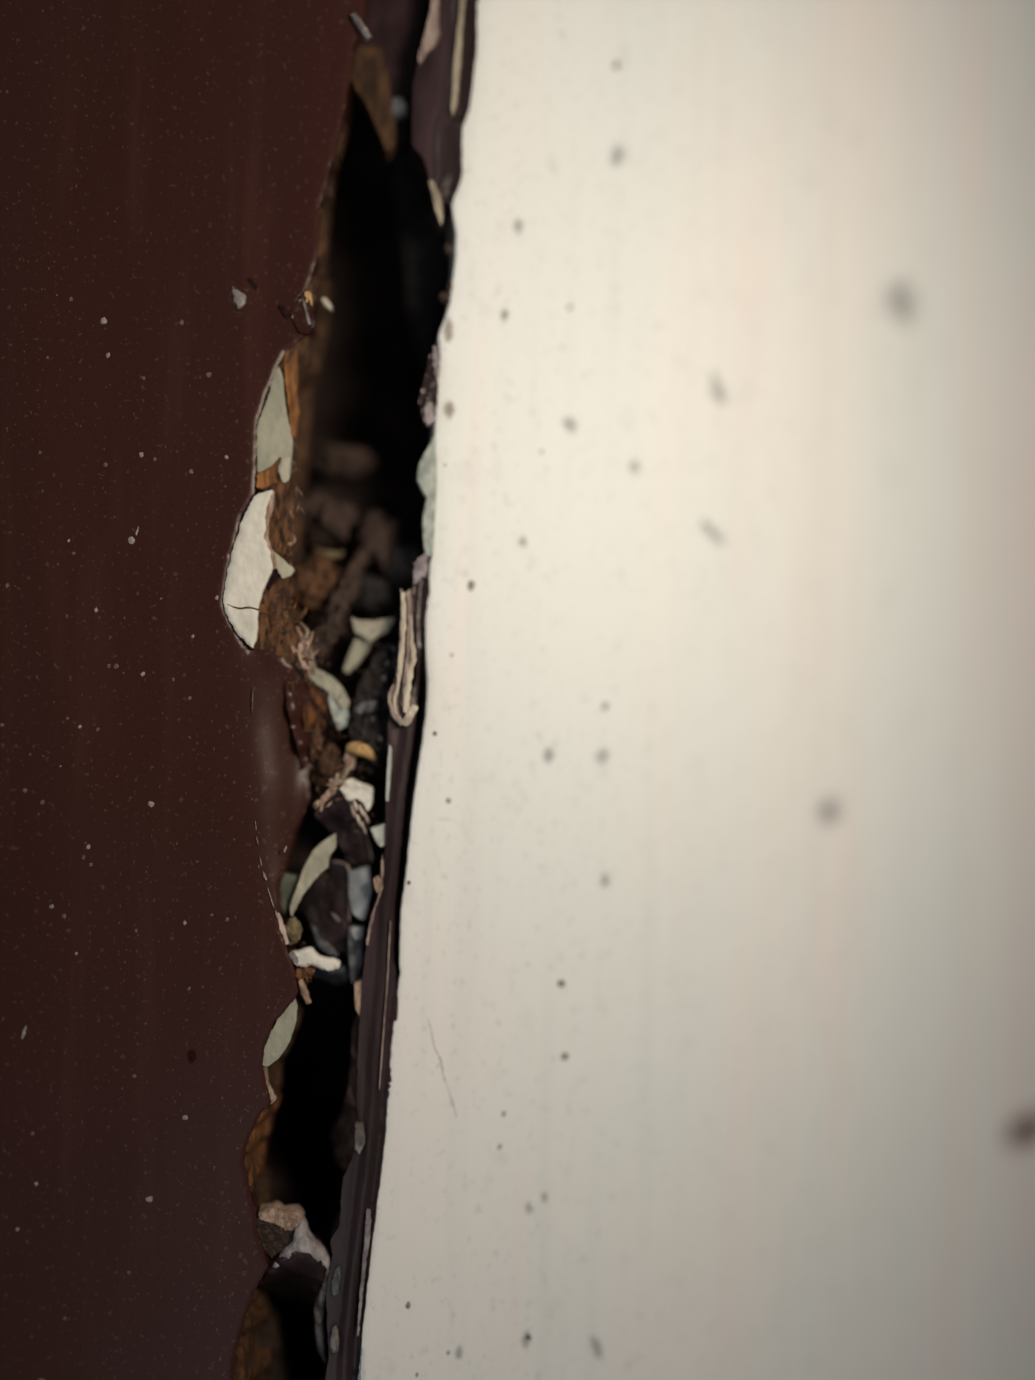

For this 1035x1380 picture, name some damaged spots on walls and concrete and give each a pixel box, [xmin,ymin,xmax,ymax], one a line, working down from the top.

peeling [418,0,465,116]
peeling [429,179,443,226]
peeling [291,291,333,335]
peeling [223,366,296,648]
peeling [413,346,440,585]
peeling [285,638,371,769]
peeling [340,752,386,846]
peeling [280,834,336,917]
peeling [289,946,341,972]
peeling [263,999,298,1104]
peeling [355,1122,365,1154]
peeling [330,1326,339,1353]